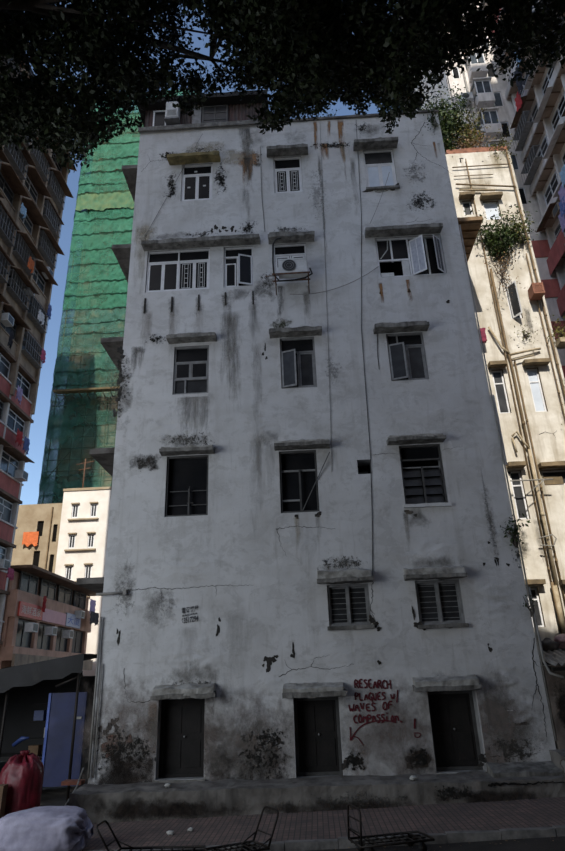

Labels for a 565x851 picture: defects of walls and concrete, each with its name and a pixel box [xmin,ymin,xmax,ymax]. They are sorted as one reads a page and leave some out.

corrosion [226,150,258,177]
corrosion [328,121,344,156]
damp [110,351,137,417]
crack [279,655,351,677]
damp [96,725,156,785]
damp [216,728,291,780]